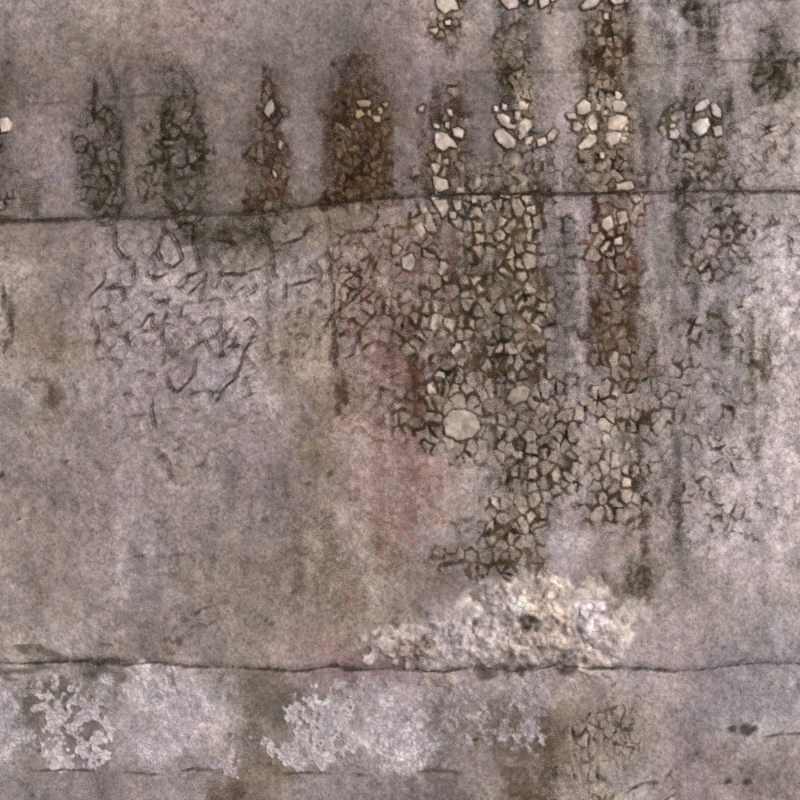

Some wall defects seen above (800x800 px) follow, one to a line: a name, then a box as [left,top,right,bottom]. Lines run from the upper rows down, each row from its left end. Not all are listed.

peeling [0,117,12,152]
crack [91,82,126,196]
crack [149,68,209,171]
rust [321,91,394,211]
crack [0,111,800,443]
peeling [320,0,756,584]
damp [0,644,549,800]
crack [5,659,800,686]
peeling [569,704,633,780]